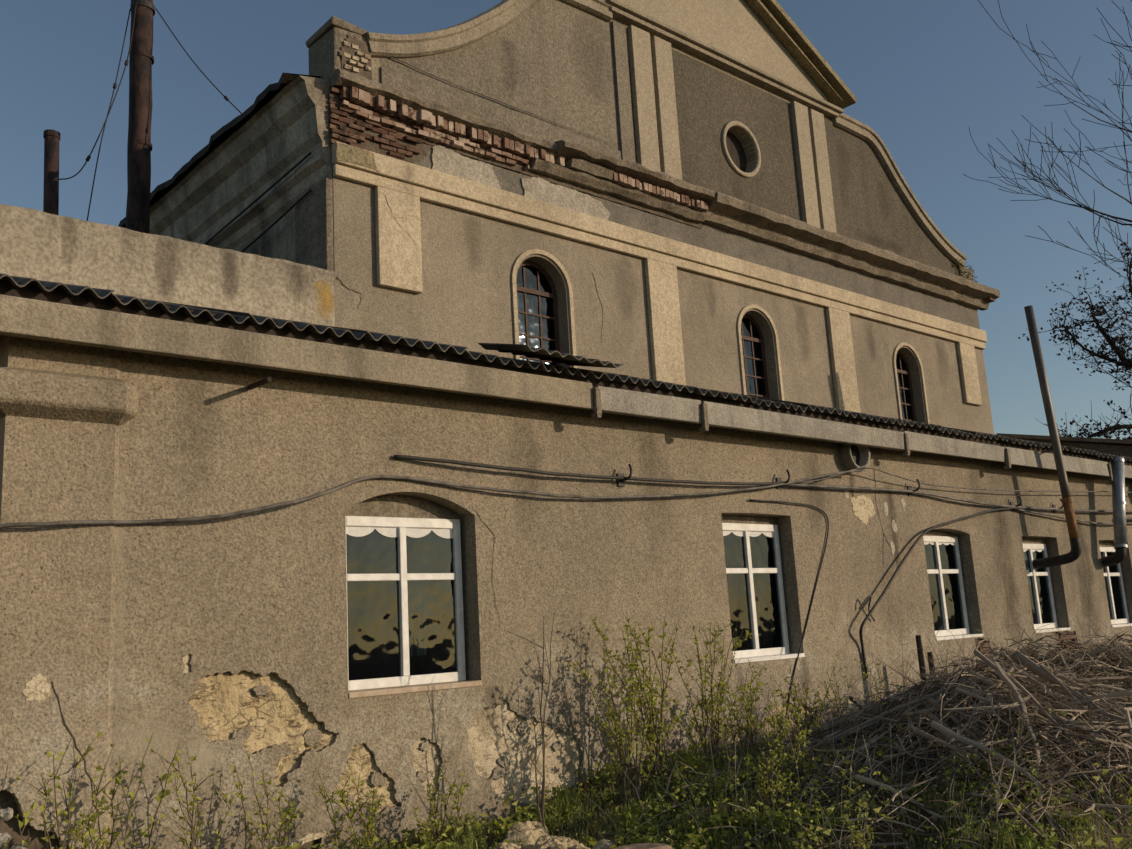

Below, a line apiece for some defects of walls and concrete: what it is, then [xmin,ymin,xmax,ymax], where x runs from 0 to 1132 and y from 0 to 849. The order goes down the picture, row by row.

flaking render [328,86,708,228]
peeling [844,489,906,556]
flaking render [0,790,68,849]
peeling [22,673,51,703]
crack [38,681,104,849]
spalling [181,654,336,786]
spalling [337,743,399,820]
spalling [410,738,441,795]
flaking render [467,701,581,807]